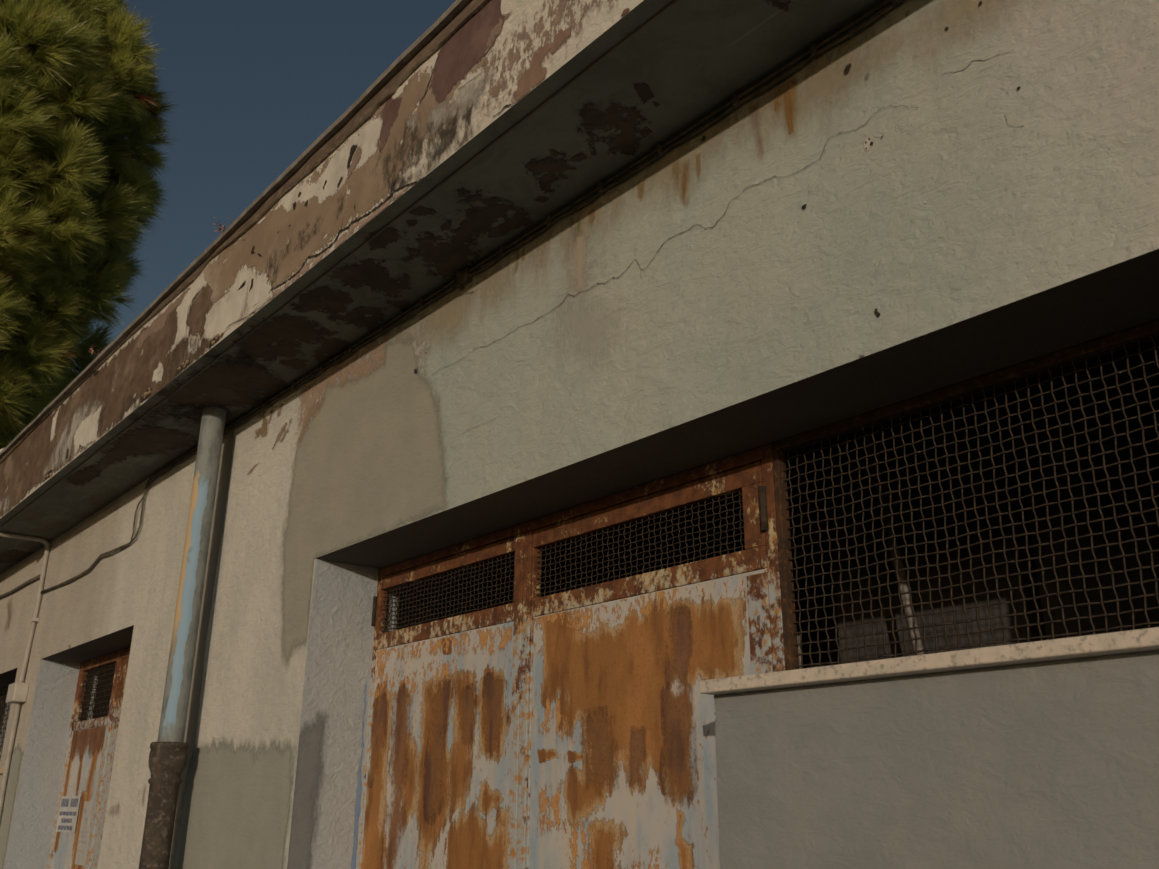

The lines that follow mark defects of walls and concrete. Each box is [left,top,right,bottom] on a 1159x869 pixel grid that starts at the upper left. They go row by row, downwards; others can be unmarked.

peeling [0,0,613,517]
crack [435,105,919,373]
rust [63,726,106,869]
rust [361,626,512,869]
rust [534,588,747,869]